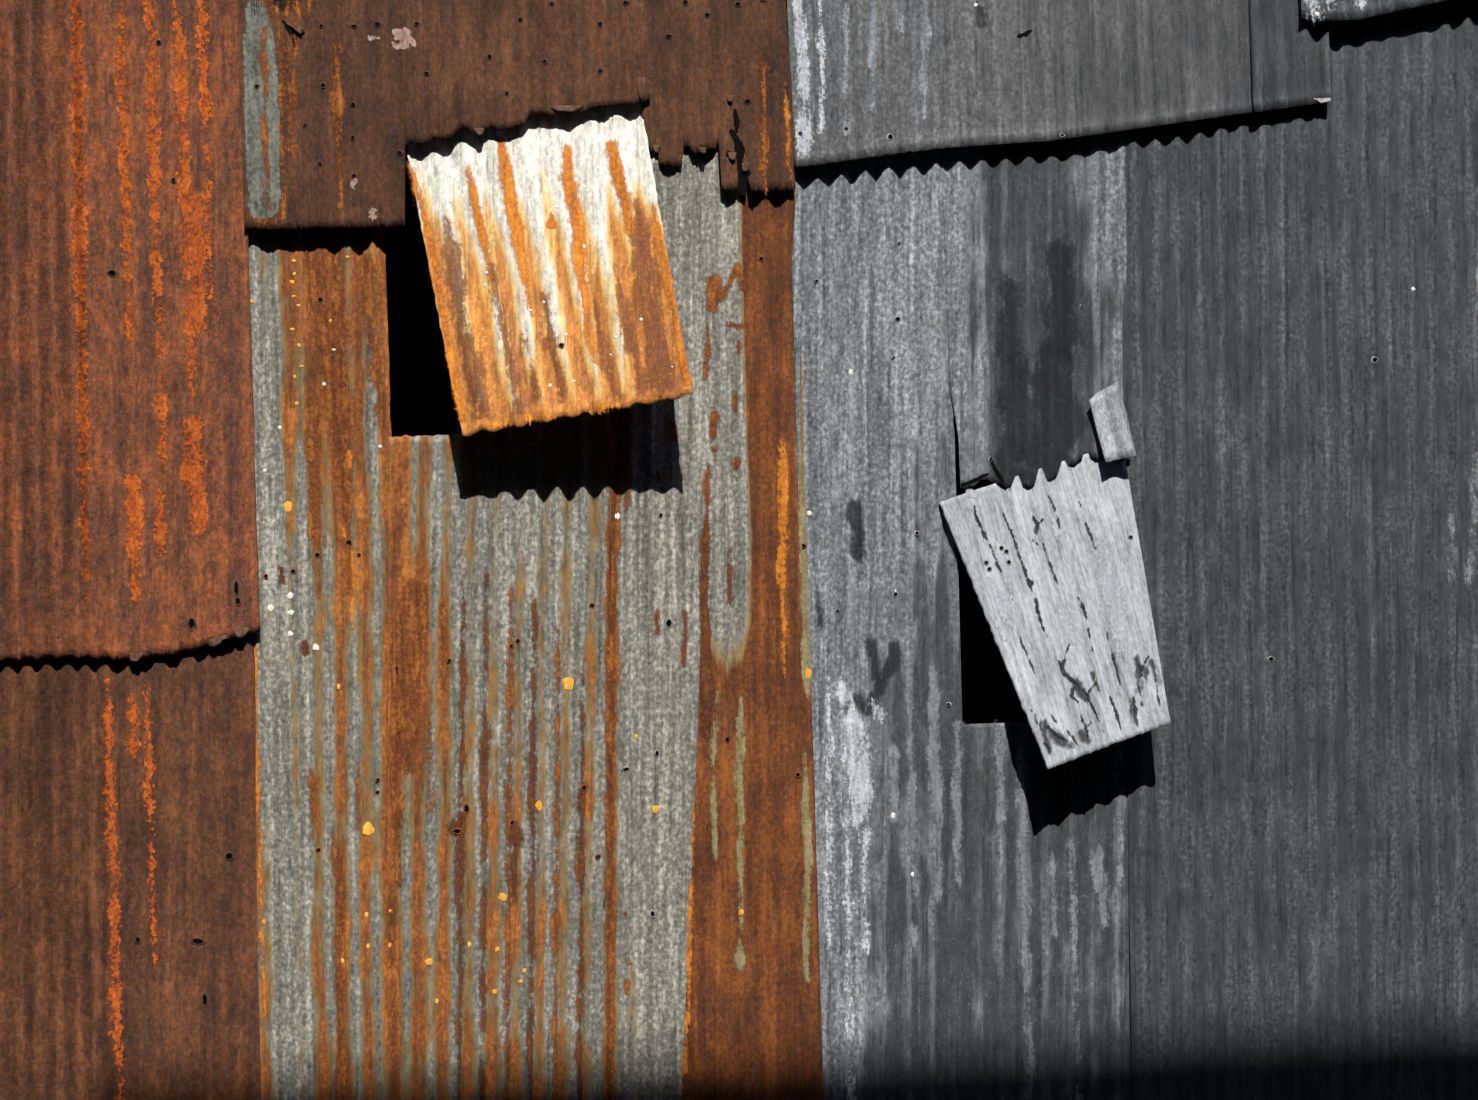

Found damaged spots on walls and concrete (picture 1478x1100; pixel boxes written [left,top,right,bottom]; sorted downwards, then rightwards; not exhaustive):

rust [69,0,91,600]
rust [114,0,215,602]
rust [261,0,313,158]
rust [329,37,346,211]
rust [756,52,792,192]
rust [385,137,748,1100]
rust [776,439,789,675]
rust [102,678,158,1100]
rust [253,633,267,1016]
rust [308,766,347,1100]